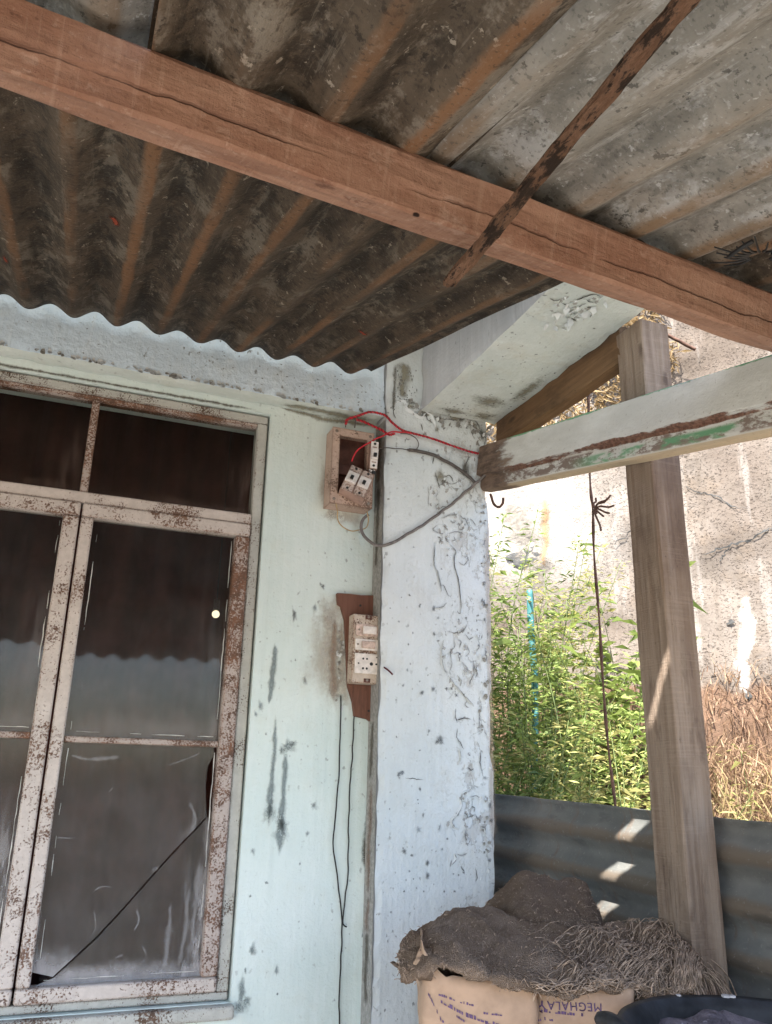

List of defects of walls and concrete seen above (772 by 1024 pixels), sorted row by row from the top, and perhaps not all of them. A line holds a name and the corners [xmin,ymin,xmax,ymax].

peeling [544,294,608,331]
leakage [255,647,277,715]
peeling [440,604,490,736]
leakage [266,727,295,849]